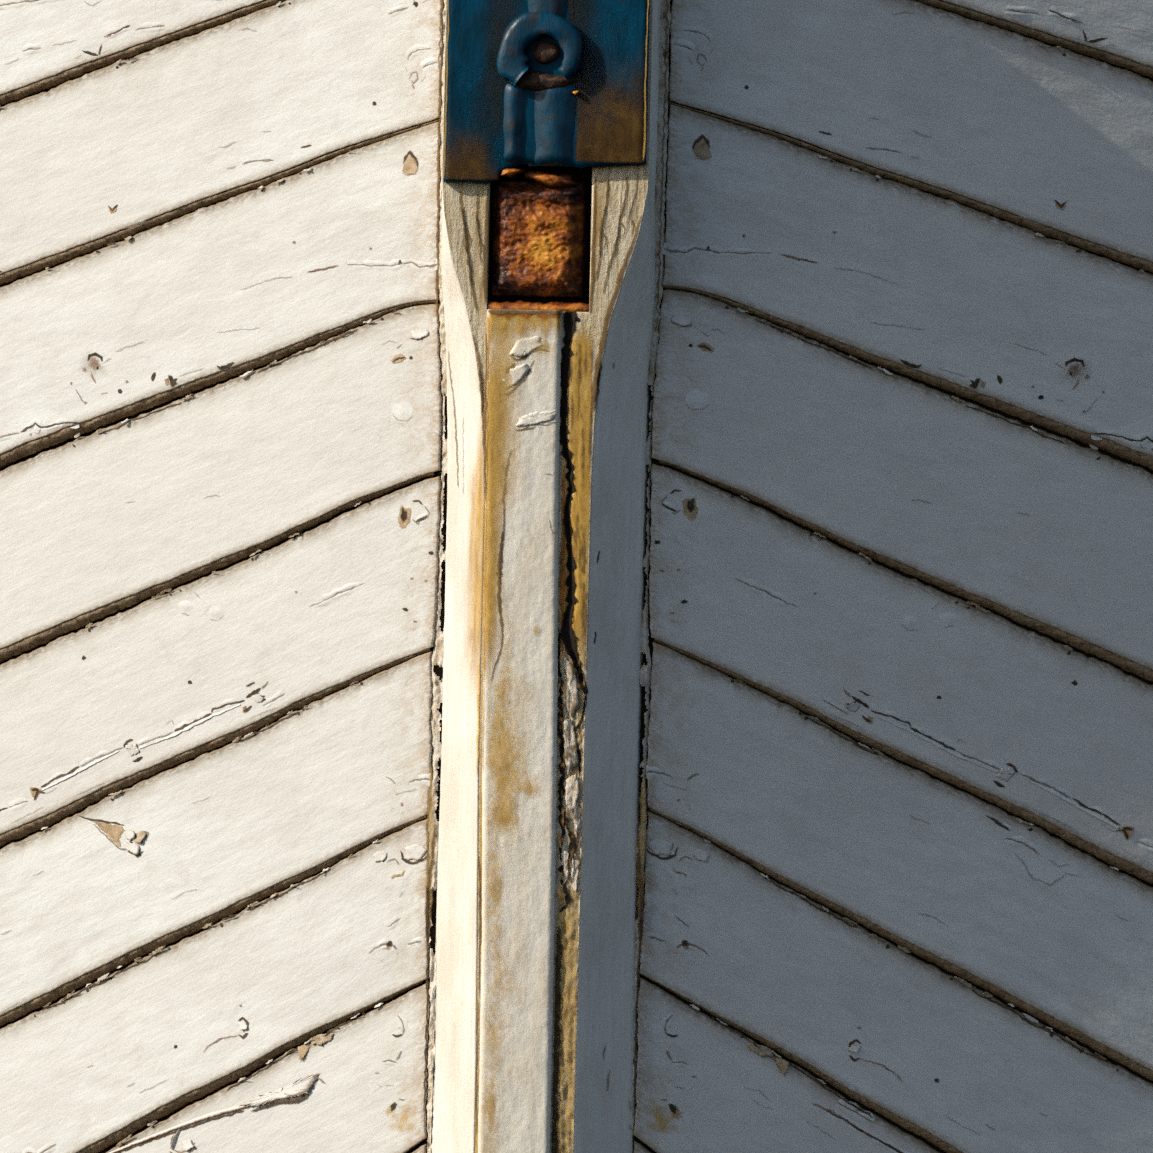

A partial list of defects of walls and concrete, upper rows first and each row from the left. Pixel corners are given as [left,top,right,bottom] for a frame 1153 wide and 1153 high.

crack [22,43,41,55]
crack [0,0,66,10]
crack [105,20,165,39]
crack [1004,5,1080,25]
peeling [500,336,543,390]
peeling [516,410,557,426]
crack [308,0,615,912]
rust [446,143,642,1153]
crack [0,690,286,814]
crack [820,696,1153,857]
spalling [77,815,148,857]
peeling [109,1073,325,1153]